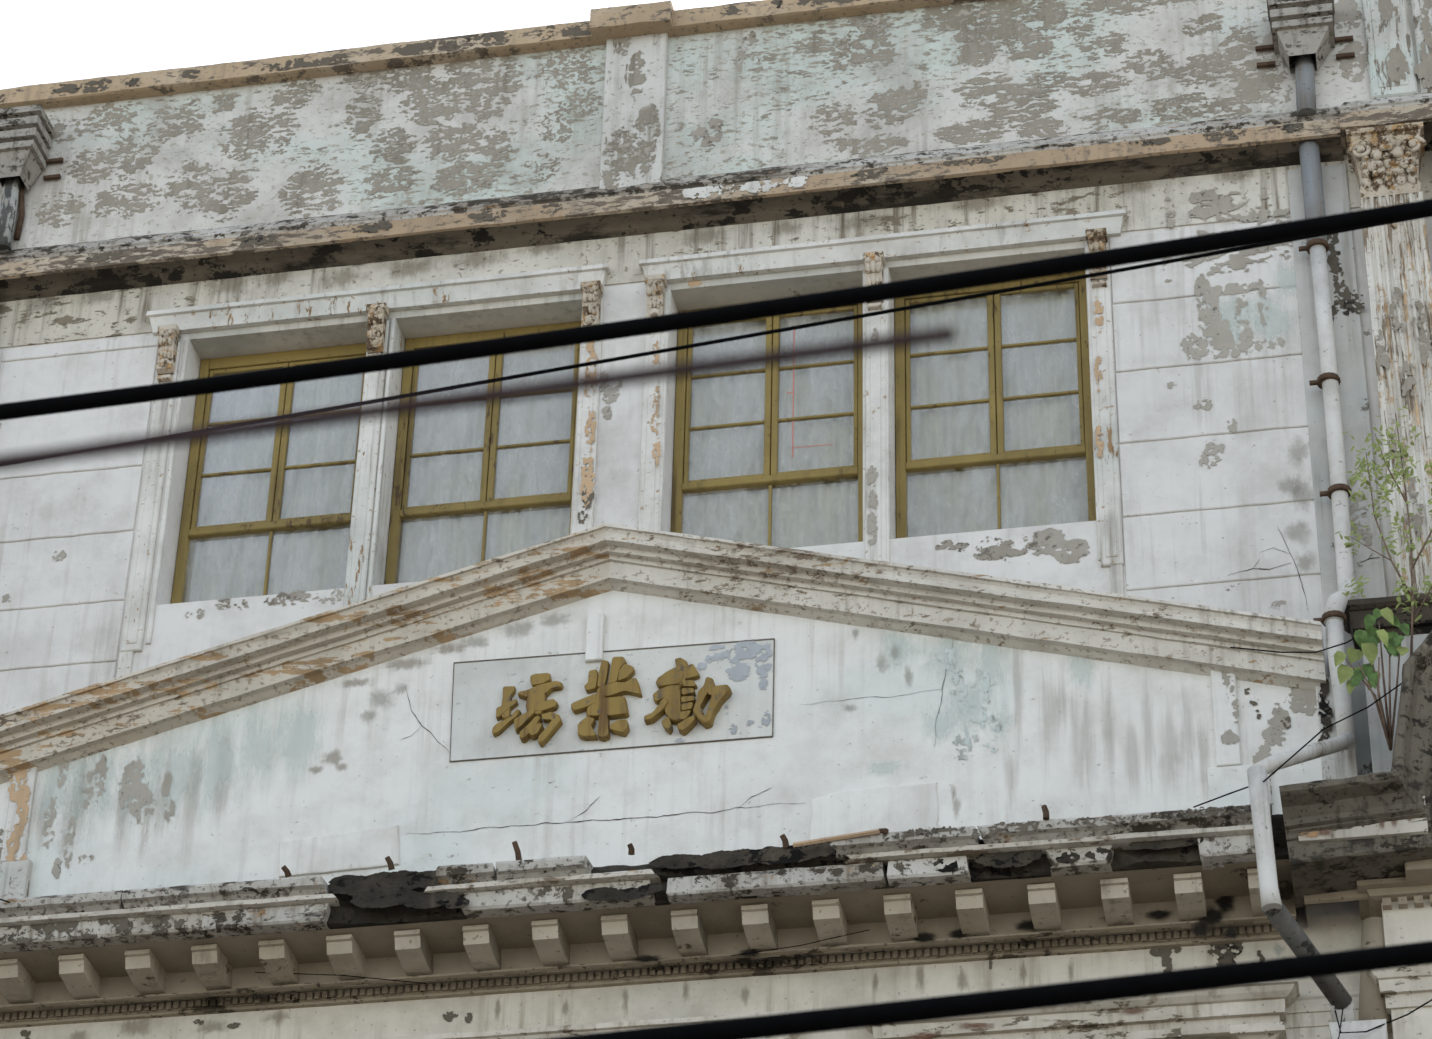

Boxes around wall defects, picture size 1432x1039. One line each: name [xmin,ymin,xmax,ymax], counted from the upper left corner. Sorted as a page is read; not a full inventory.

peeling [33,22,603,228]
peeling [601,37,661,189]
peeling [682,176,808,199]
peeling [808,80,929,178]
peeling [920,0,1304,166]
peeling [1162,241,1295,364]
peeling [1327,233,1365,321]
peeling [935,528,1090,564]
spalling [1221,671,1333,804]
peeling [0,754,176,879]
spalling [328,870,470,909]
spalling [581,841,836,901]